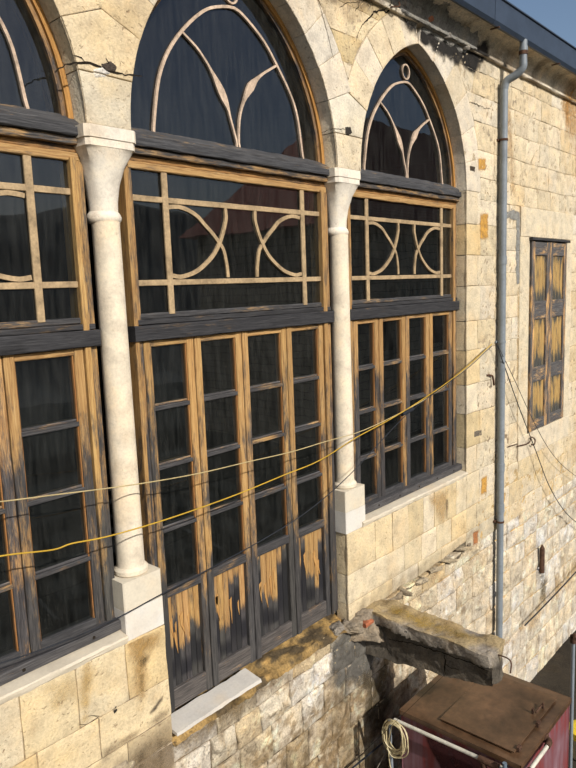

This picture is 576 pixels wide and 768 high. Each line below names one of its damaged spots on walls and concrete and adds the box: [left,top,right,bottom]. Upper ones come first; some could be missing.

crack [341,2,391,41]
leakage [404,19,490,73]
crack [55,55,142,77]
rust [480,214,488,238]
crack [347,639,487,768]